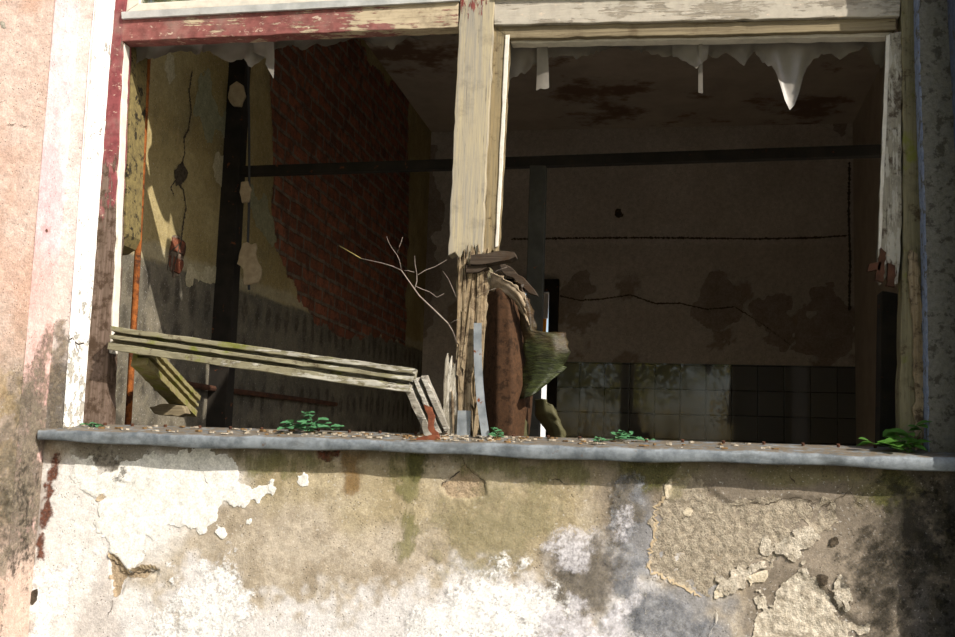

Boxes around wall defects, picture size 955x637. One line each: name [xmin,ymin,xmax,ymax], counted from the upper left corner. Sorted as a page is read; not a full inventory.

crack [167,71,193,276]
flaking render [270,39,410,346]
crack [560,294,791,345]
damp [0,320,75,637]
peeling [70,448,277,597]
spalling [645,477,870,637]
damp [835,476,955,637]